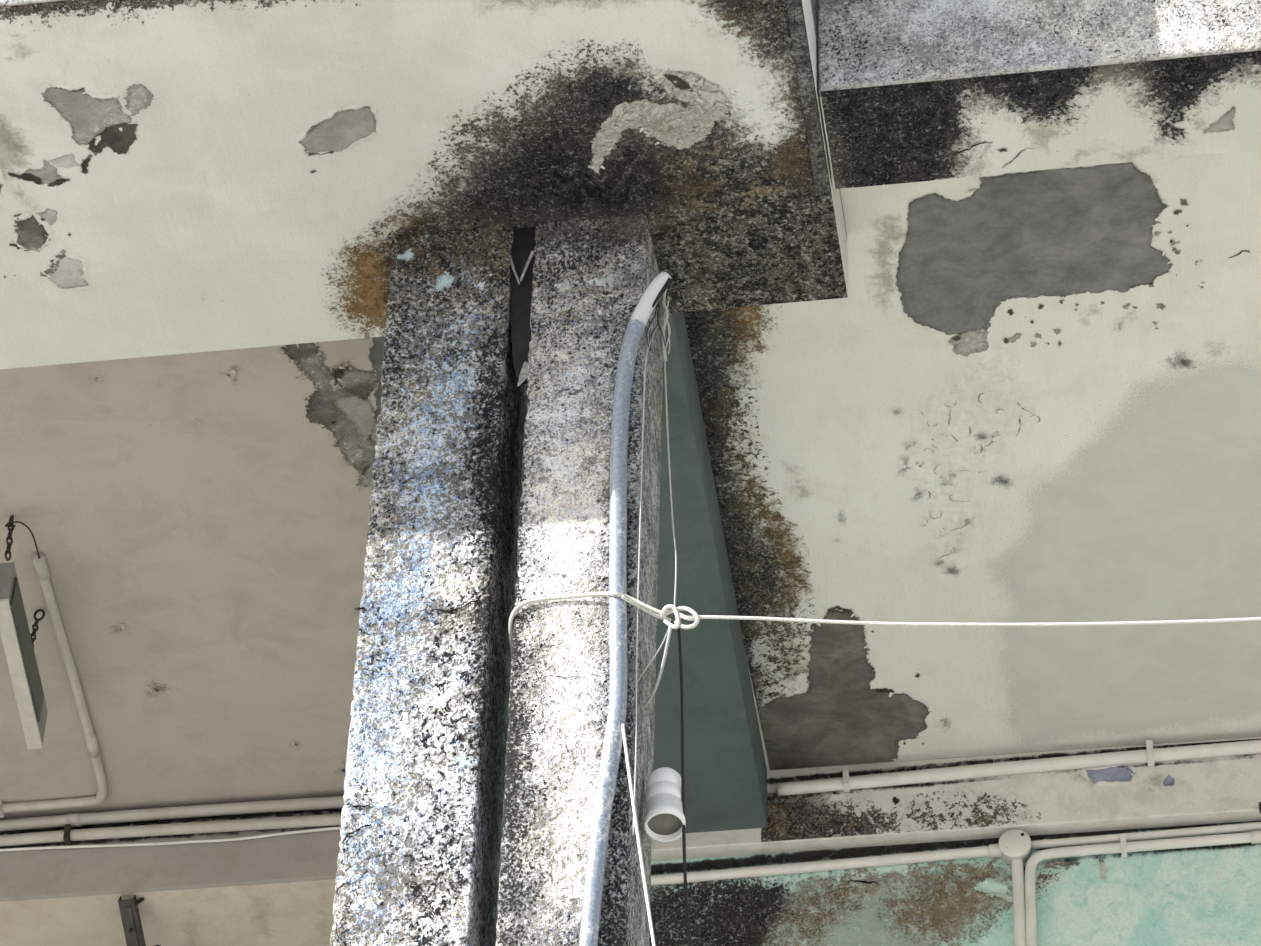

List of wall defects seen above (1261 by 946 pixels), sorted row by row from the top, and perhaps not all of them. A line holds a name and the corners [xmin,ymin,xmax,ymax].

damp [0,0,360,31]
peeling [8,83,154,187]
peeling [296,103,380,173]
peeling [588,71,731,174]
spalling [9,208,71,253]
spalling [1000,301,1062,347]
peeling [278,343,378,491]
damp [360,0,1261,766]
damp [1037,832,1261,862]
damp [649,850,1025,946]